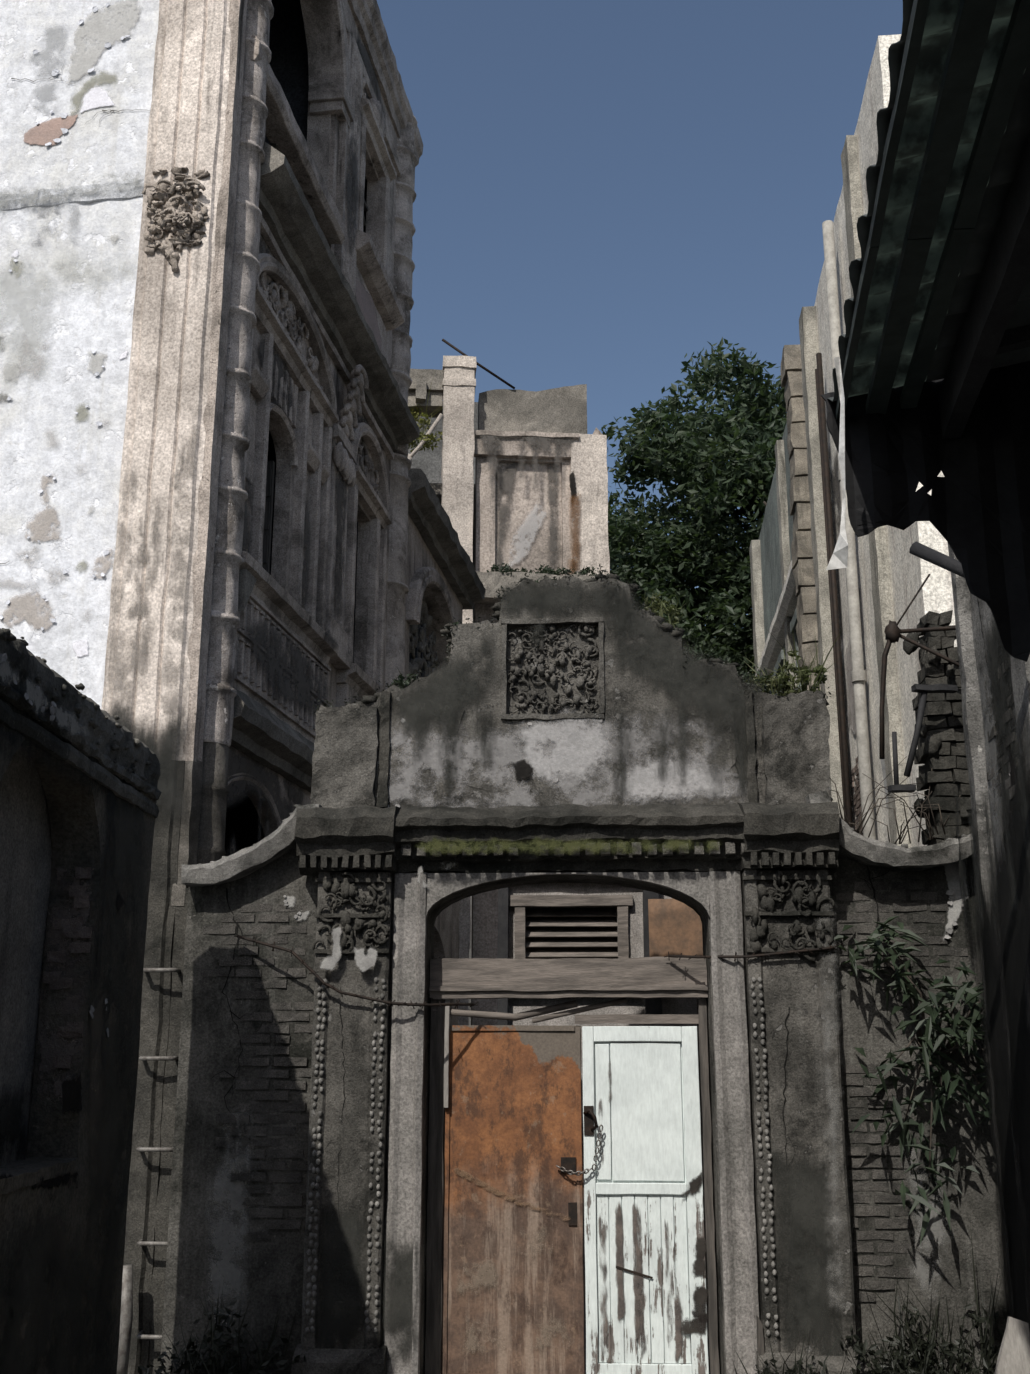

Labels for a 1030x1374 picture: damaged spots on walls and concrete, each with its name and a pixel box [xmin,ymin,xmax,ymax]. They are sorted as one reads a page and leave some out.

peeling [24,0,140,146]
damp [481,435,756,793]
damp [399,640,491,786]
peeling [681,1172,703,1197]
peeling [598,1204,646,1361]
peeling [664,1222,709,1362]